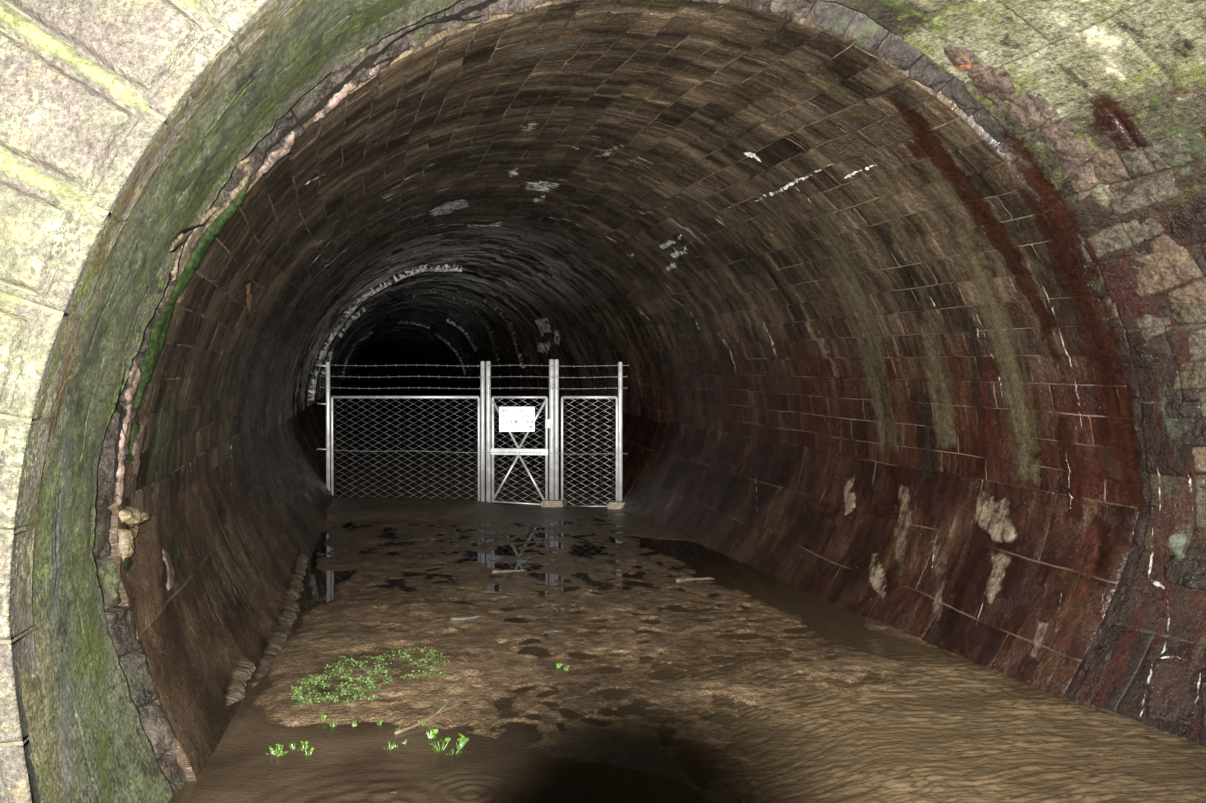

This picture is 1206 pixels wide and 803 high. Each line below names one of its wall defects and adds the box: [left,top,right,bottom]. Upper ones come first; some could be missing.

flaking render [314,83,356,122]
crack [249,0,498,180]
rust [1087,92,1145,149]
crack [163,211,215,280]
flaking render [169,131,295,281]
damp [845,165,907,246]
damp [917,285,956,478]
damp [955,224,1039,481]
flaking render [115,361,150,561]
spalling [844,478,856,515]
spalling [869,554,885,596]
spalling [975,492,1015,604]